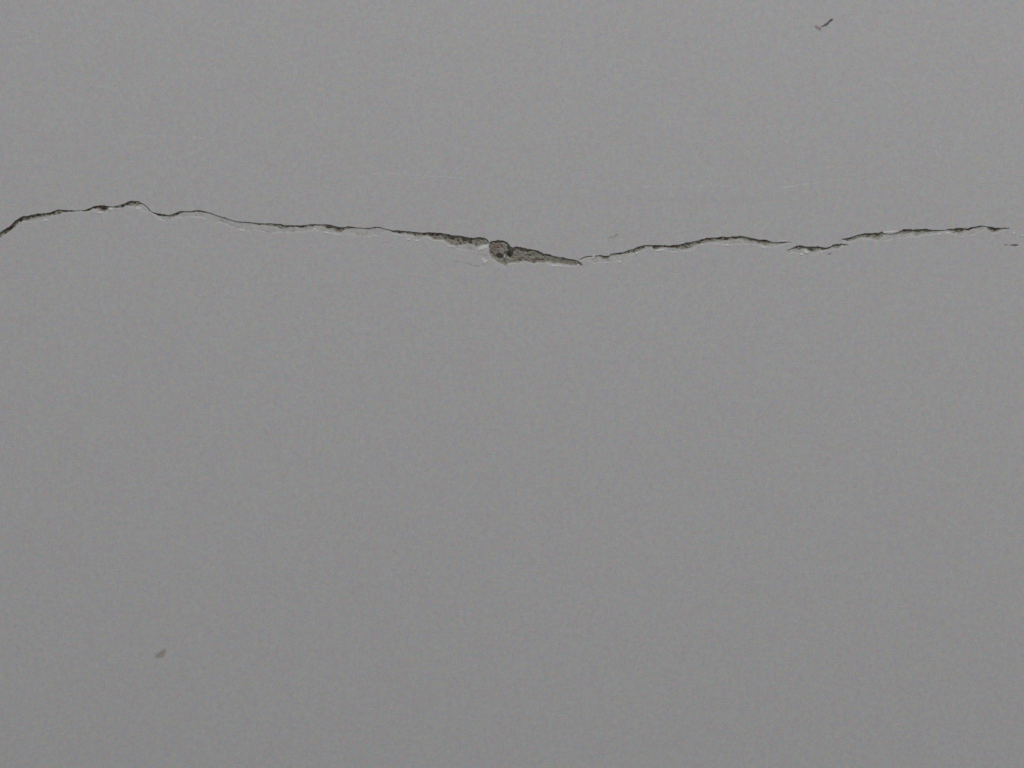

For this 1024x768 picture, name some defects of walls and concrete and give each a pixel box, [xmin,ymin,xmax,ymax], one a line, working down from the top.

crack [0,201,489,251]
crack [579,225,1024,264]